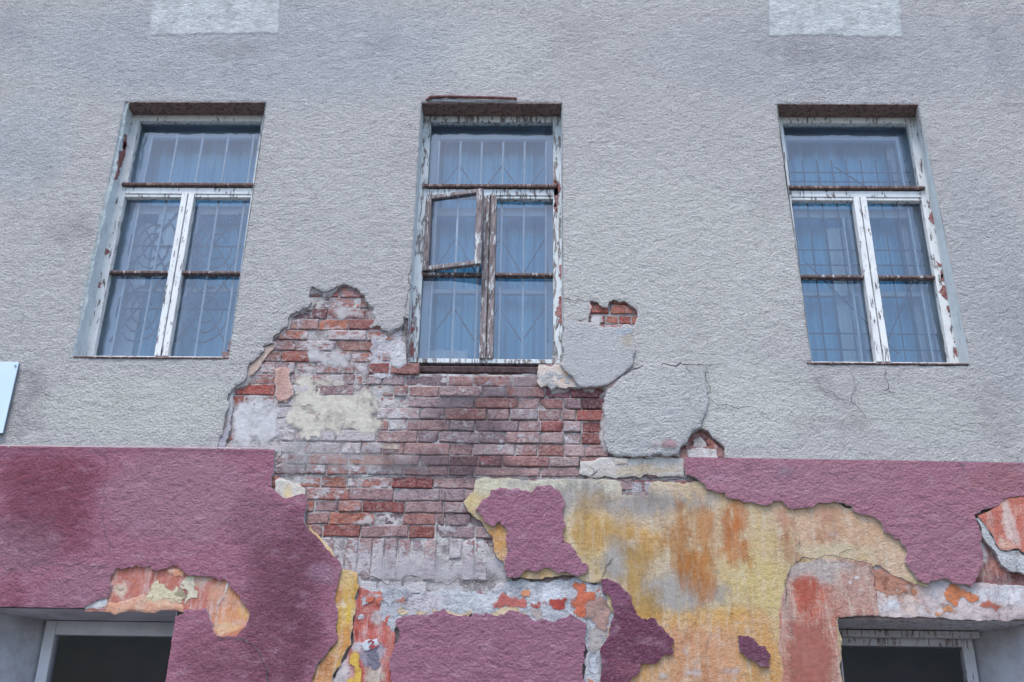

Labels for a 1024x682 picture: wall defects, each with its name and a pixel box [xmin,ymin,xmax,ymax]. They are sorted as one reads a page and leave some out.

peeling [553,180,561,213]
peeling [937,262,951,317]
crack [624,362,751,409]
crack [817,369,895,414]
flaking render [218,285,1024,682]
flaking render [84,565,250,637]